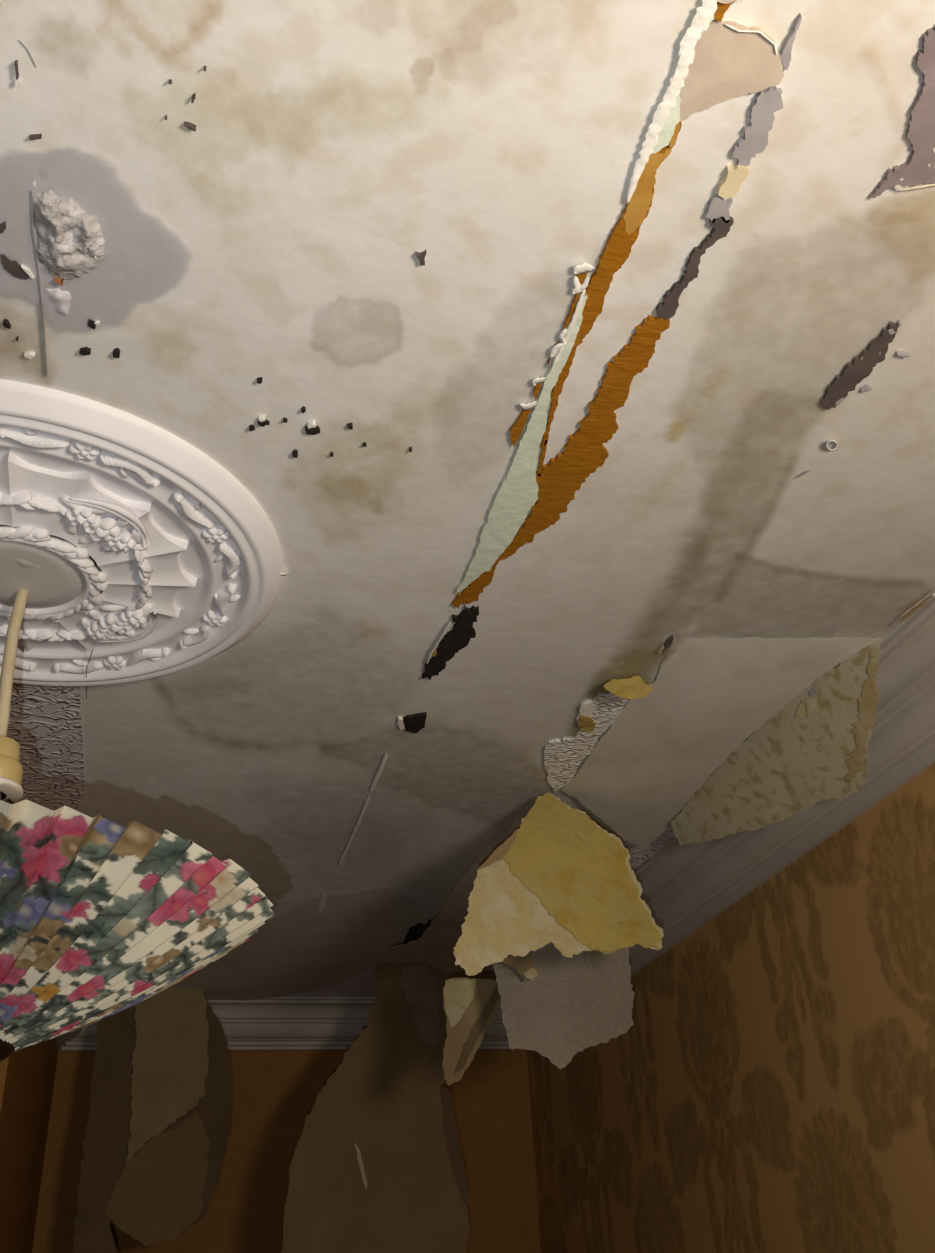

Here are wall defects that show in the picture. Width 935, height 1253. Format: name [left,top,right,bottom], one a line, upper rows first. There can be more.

peeling [870,26,935,198]
flaking render [0,181,106,316]
peeling [3,318,36,359]
peeling [249,415,288,432]
peeling [301,406,320,435]